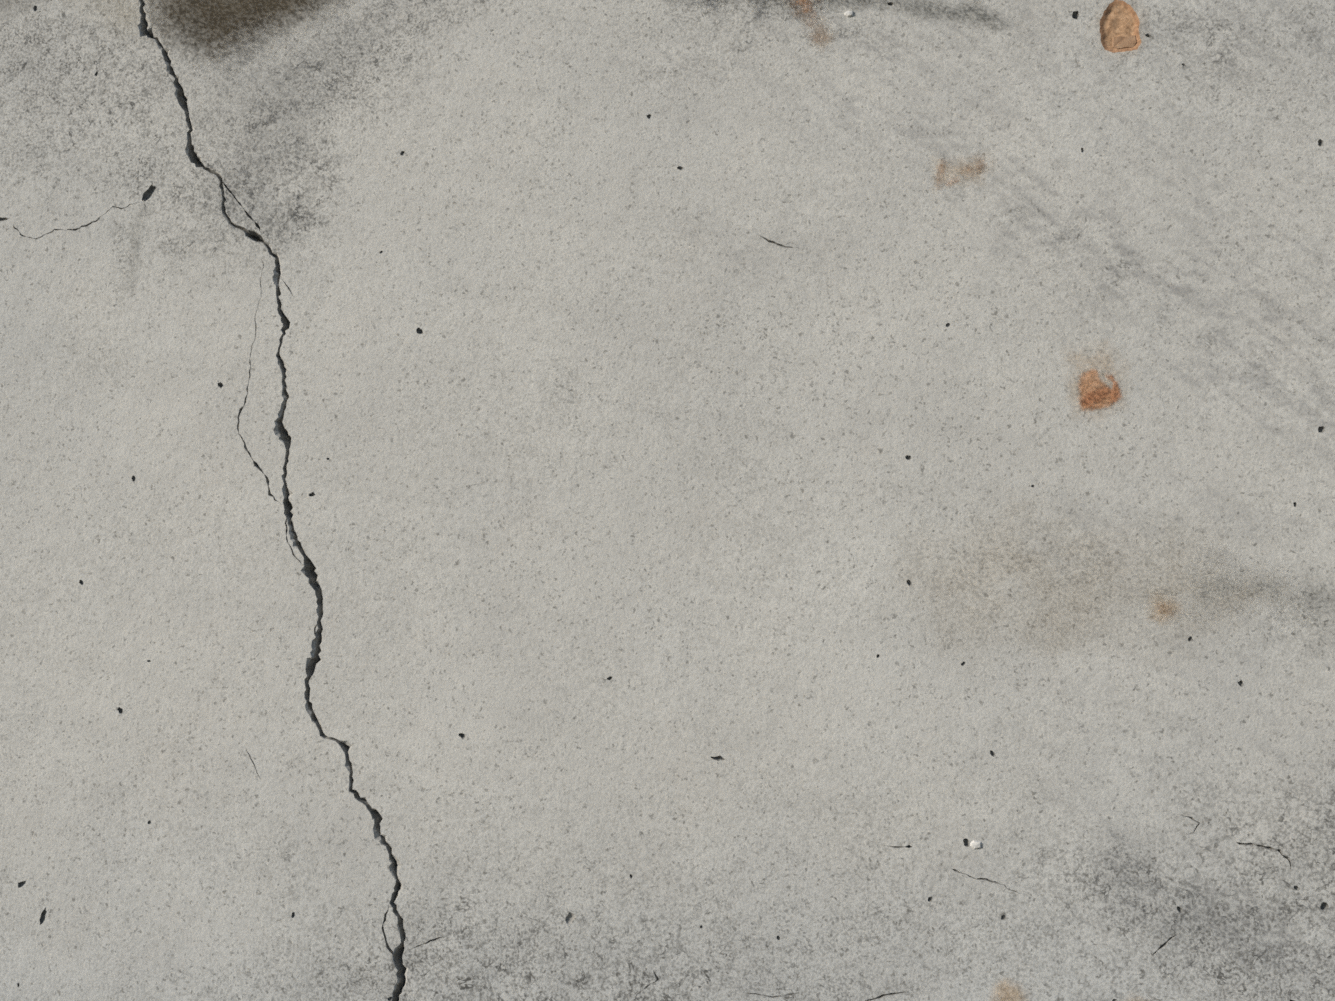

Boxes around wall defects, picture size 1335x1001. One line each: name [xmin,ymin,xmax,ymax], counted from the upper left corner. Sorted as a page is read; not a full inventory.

leakage [150,0,327,58]
leakage [829,0,995,26]
corrosion [1080,371,1120,409]
crack [138,0,448,1001]